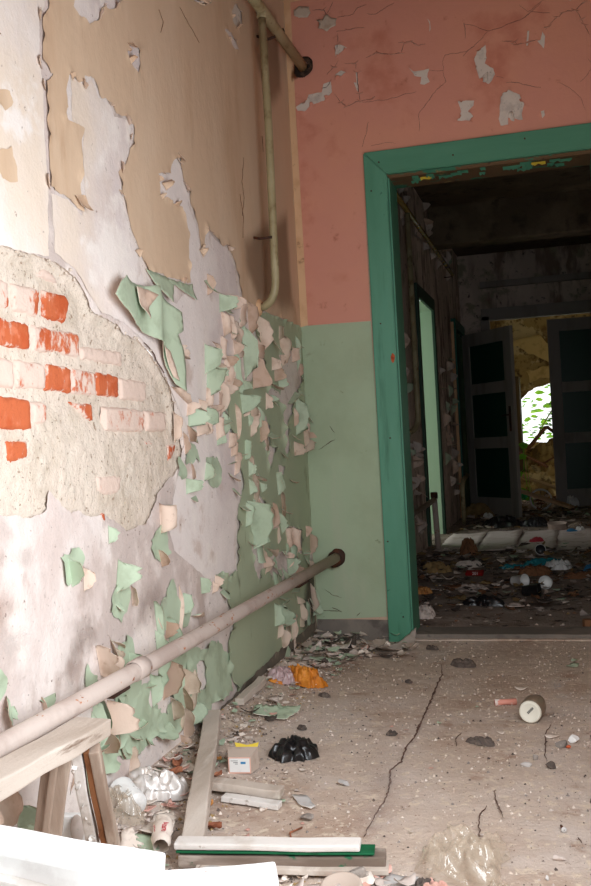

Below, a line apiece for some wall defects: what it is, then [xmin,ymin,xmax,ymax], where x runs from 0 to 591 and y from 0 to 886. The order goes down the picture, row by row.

peeling [296,71,345,111]
crack [313,0,589,131]
peeling [457,100,474,122]
peeling [474,45,495,84]
peeling [499,90,524,126]
peeling [274,583,371,660]
peeling [85,635,143,687]
peeling [0,669,18,728]
peeling [39,693,56,710]
peeling [91,647,208,776]
peeling [228,707,277,737]
crack [364,665,443,837]